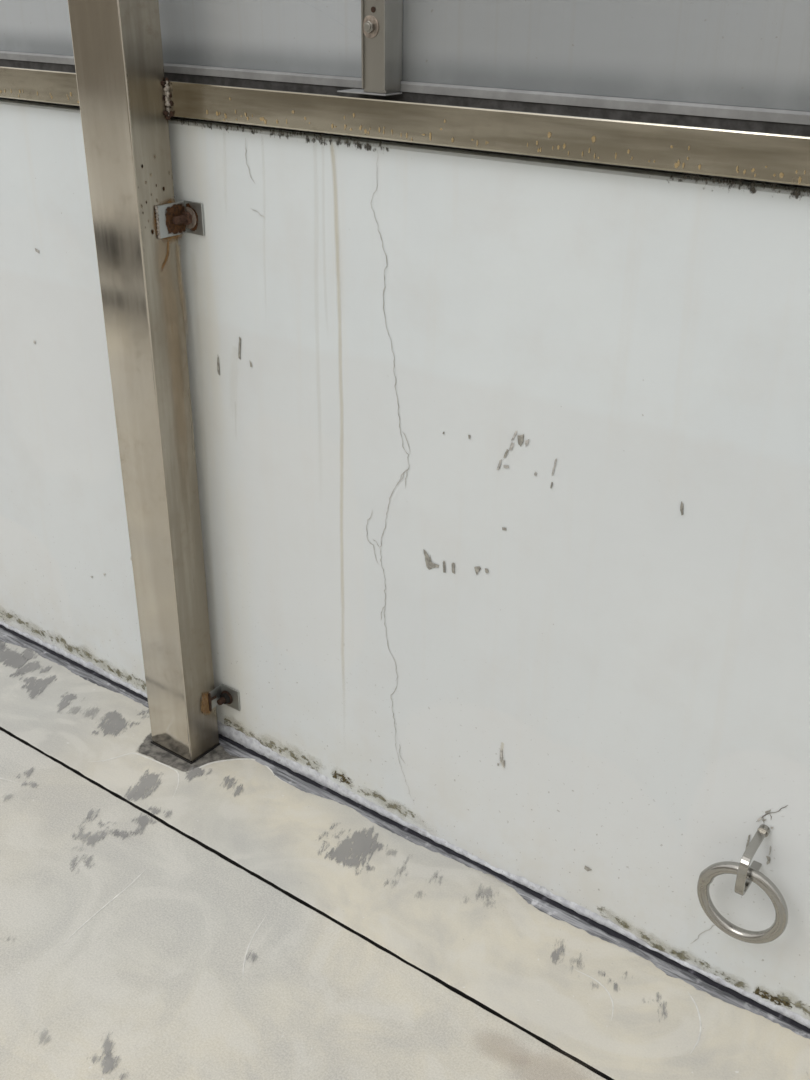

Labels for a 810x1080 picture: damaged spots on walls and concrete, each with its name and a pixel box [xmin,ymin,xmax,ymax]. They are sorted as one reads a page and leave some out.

water stain [670,146,809,199]
corrosion [143,184,198,270]
crack [366,148,414,802]
peeling [497,431,529,470]
peeling [423,549,455,574]
water stain [138,733,245,772]